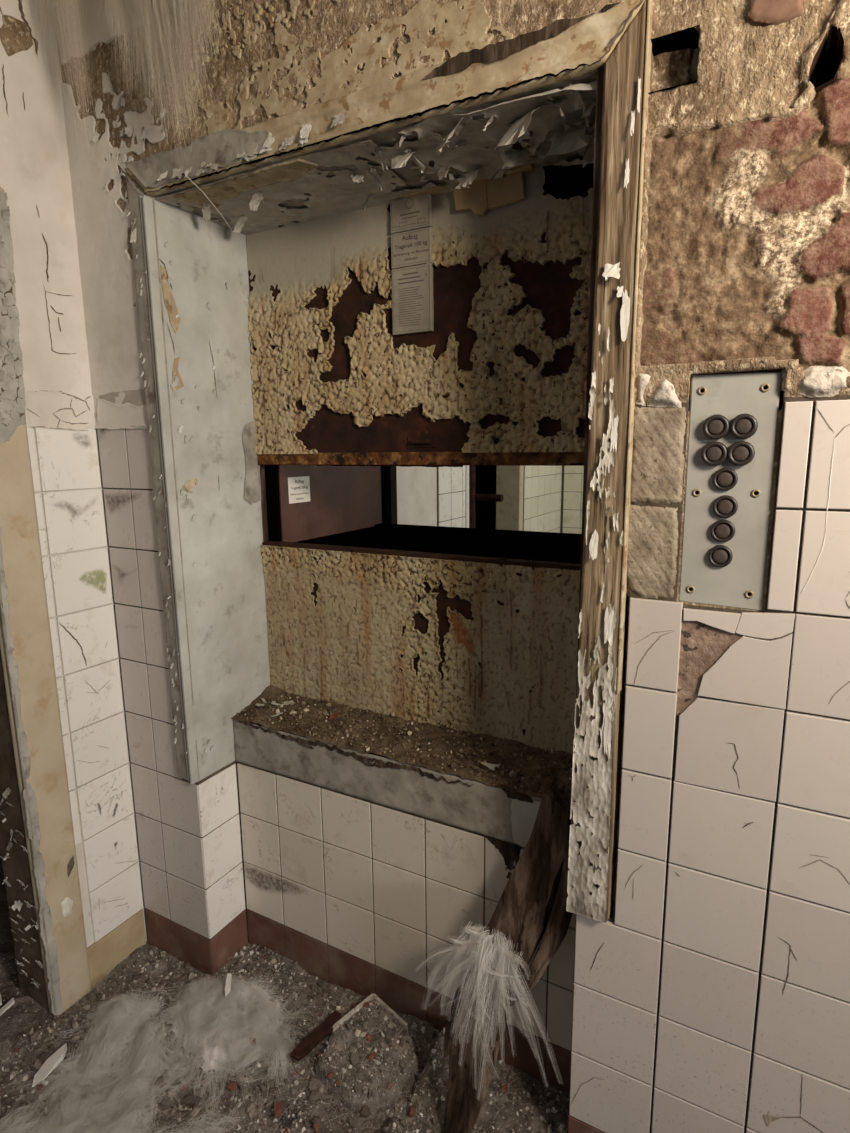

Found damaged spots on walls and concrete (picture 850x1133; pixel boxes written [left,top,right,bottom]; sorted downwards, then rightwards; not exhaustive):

crack [0,280,15,319]
crack [0,356,91,431]
crack [36,205,77,354]
corrosion [249,271,281,359]
peeling [0,0,620,444]
corrosion [287,247,585,467]
flaking render [586,0,850,599]
corrosion [400,580,483,710]
spalling [675,617,744,715]
peeling [0,528,64,1016]
peeling [566,582,617,923]
crack [780,1079,823,1133]